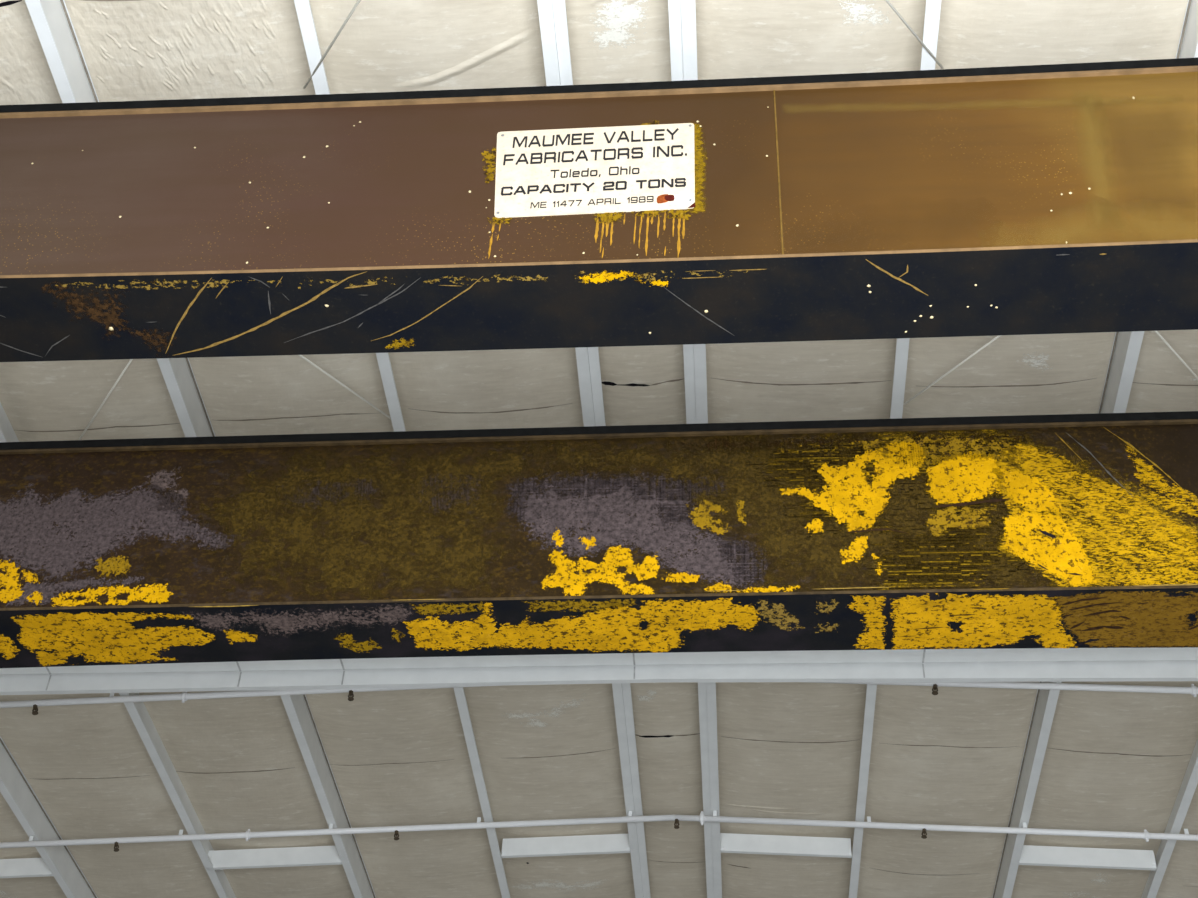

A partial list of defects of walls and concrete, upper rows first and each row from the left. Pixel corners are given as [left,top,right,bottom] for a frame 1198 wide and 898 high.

water stain [589,0,653,49]
peeling [0,429,1198,667]